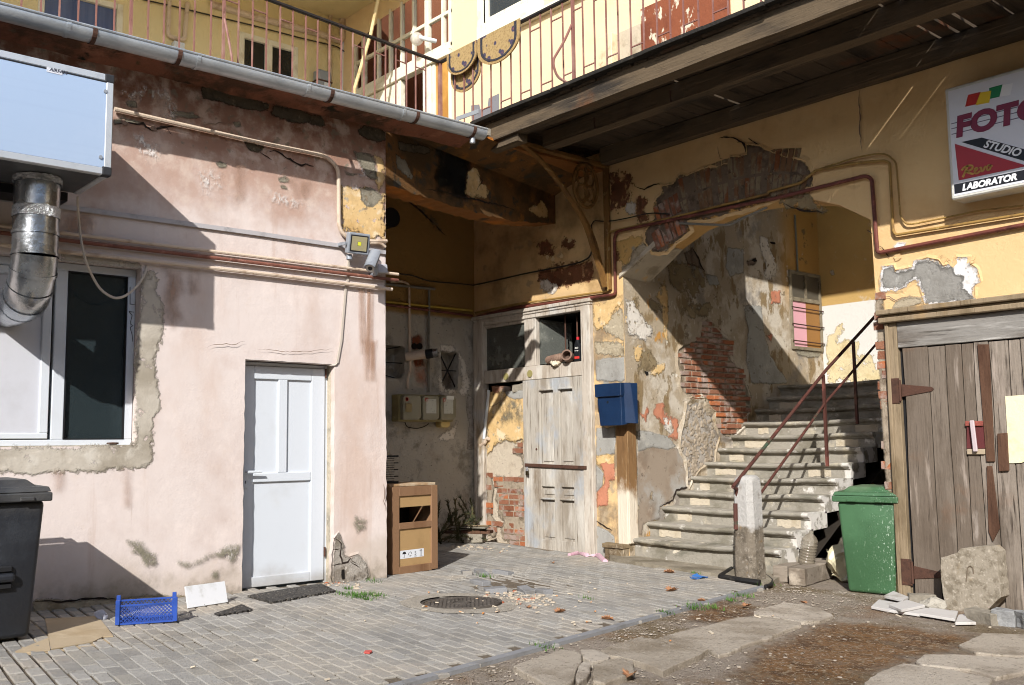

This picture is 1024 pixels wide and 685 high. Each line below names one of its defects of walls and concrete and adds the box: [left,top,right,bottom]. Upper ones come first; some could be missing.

crack [118,119,174,134]
crack [260,150,312,167]
peeling [340,151,413,246]
peeling [465,167,489,199]
peeling [535,236,594,294]
spalling [593,142,828,490]
peeling [795,242,983,492]
spalling [466,389,525,546]
peeling [596,454,615,507]
damp [128,541,157,565]
damp [178,545,239,566]
spalling [328,531,371,583]